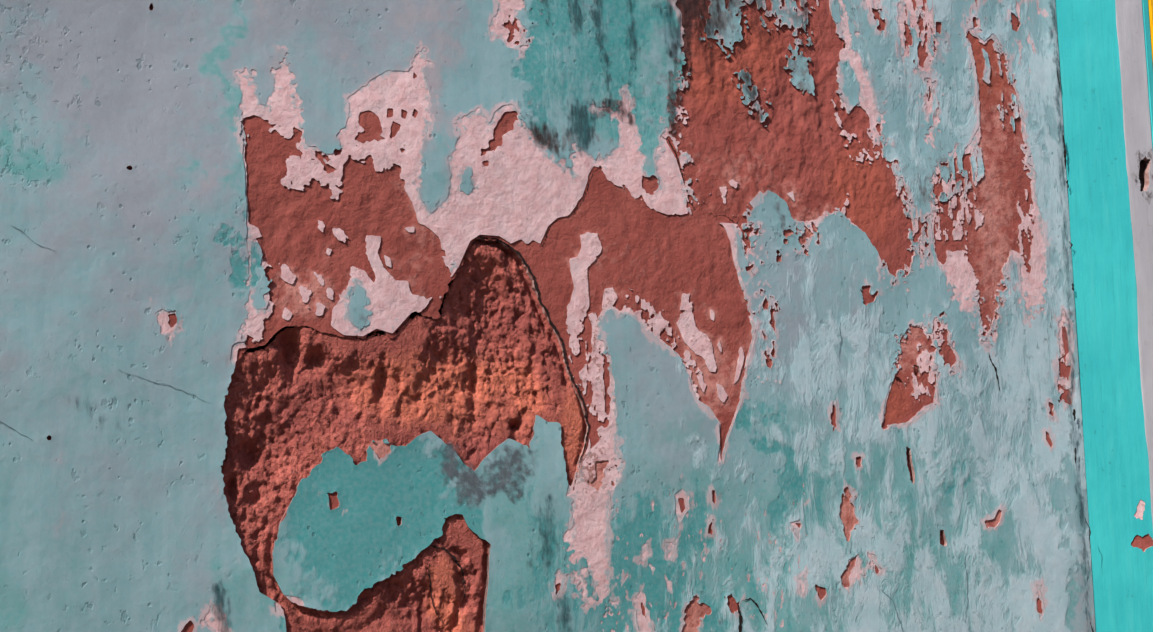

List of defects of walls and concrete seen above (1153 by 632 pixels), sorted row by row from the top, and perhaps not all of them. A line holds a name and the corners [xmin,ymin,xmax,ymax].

peeling [181,604,229,632]
peeling [232,0,1048,632]